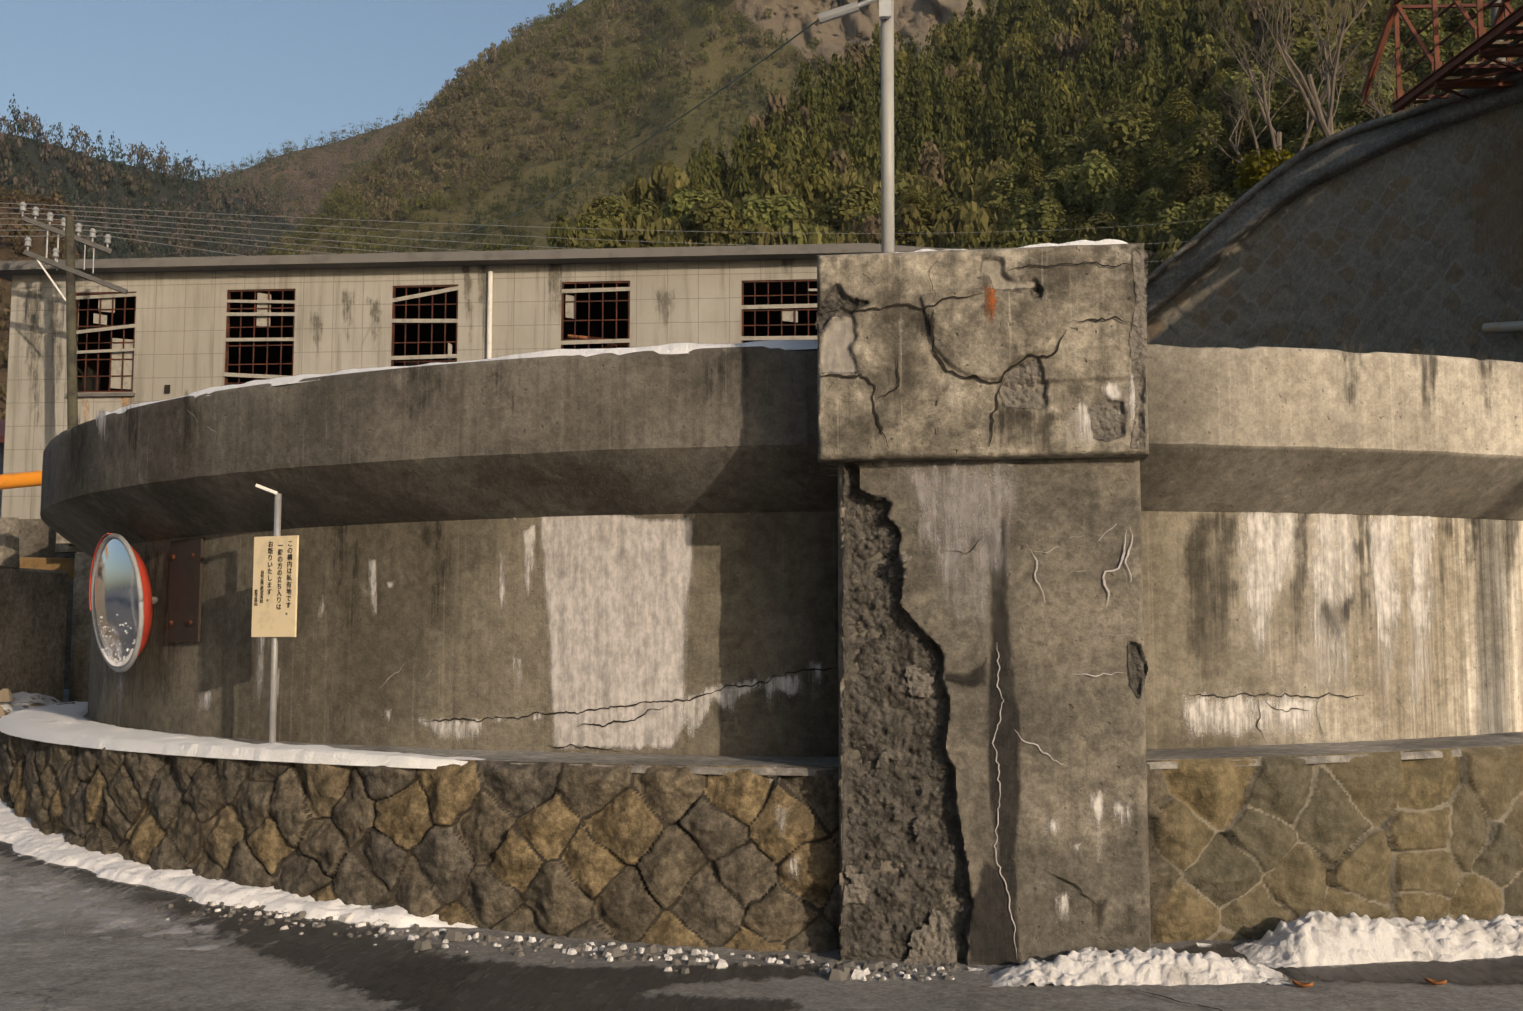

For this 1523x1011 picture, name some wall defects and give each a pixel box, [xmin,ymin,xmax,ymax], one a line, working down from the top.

crack [816,258,1141,447]
corrosion [986,288,996,317]
water stain [1185,512,1478,689]
water stain [1506,519,1518,567]
crack [380,661,838,752]
spalling [840,462,972,967]
water stain [911,462,1020,965]
crack [944,650,1066,954]
crack [1045,869,1099,907]
efflorescence [1185,693,1313,734]